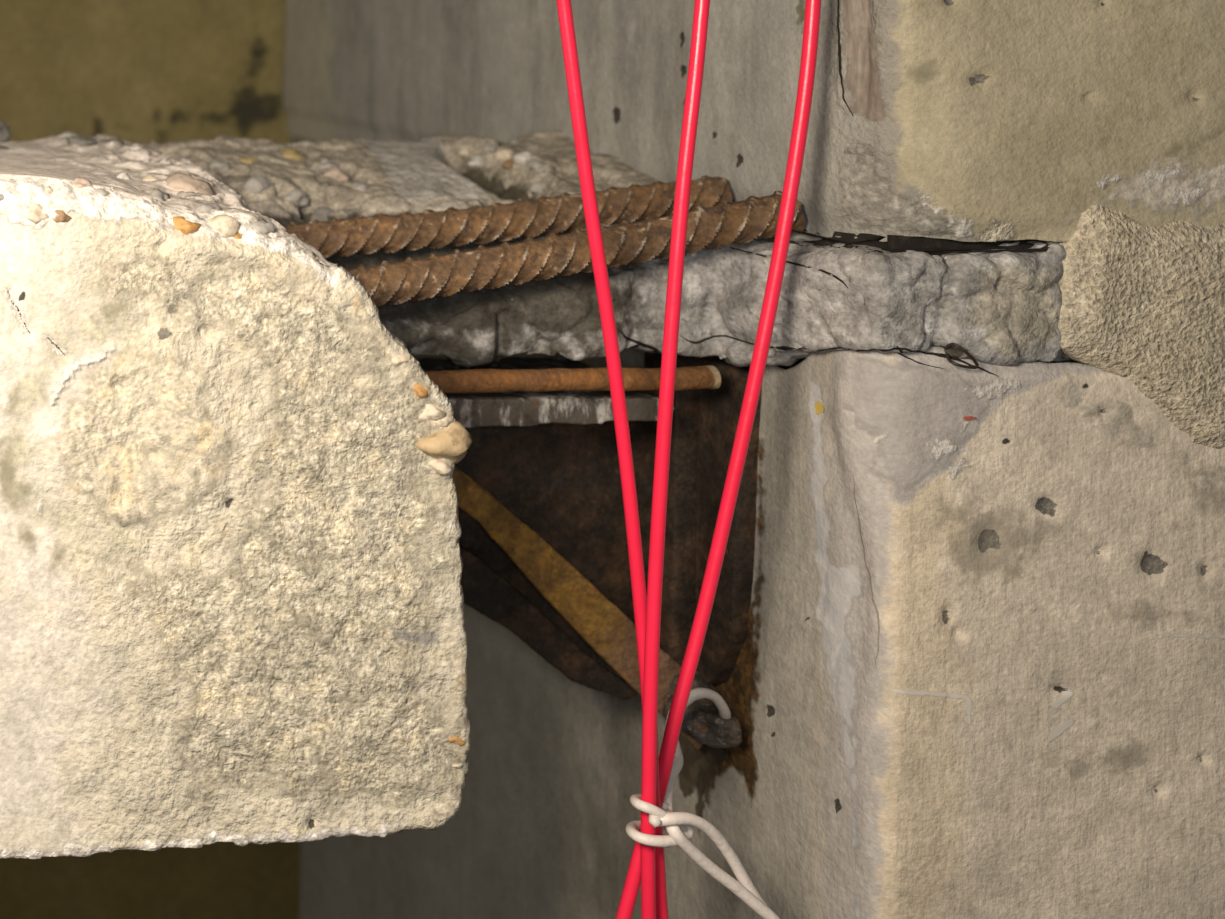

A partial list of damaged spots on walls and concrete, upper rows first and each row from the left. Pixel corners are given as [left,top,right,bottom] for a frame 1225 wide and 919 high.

water stain [203,88,281,136]
spalling [685,175,782,255]
spalling [791,200,804,234]
spalling [834,143,1014,242]
peeling [1096,156,1225,220]
crack [730,229,1051,288]
crack [616,328,999,377]
peeling [1061,377,1152,446]
peeling [0,142,676,824]
corrosion [715,566,764,798]